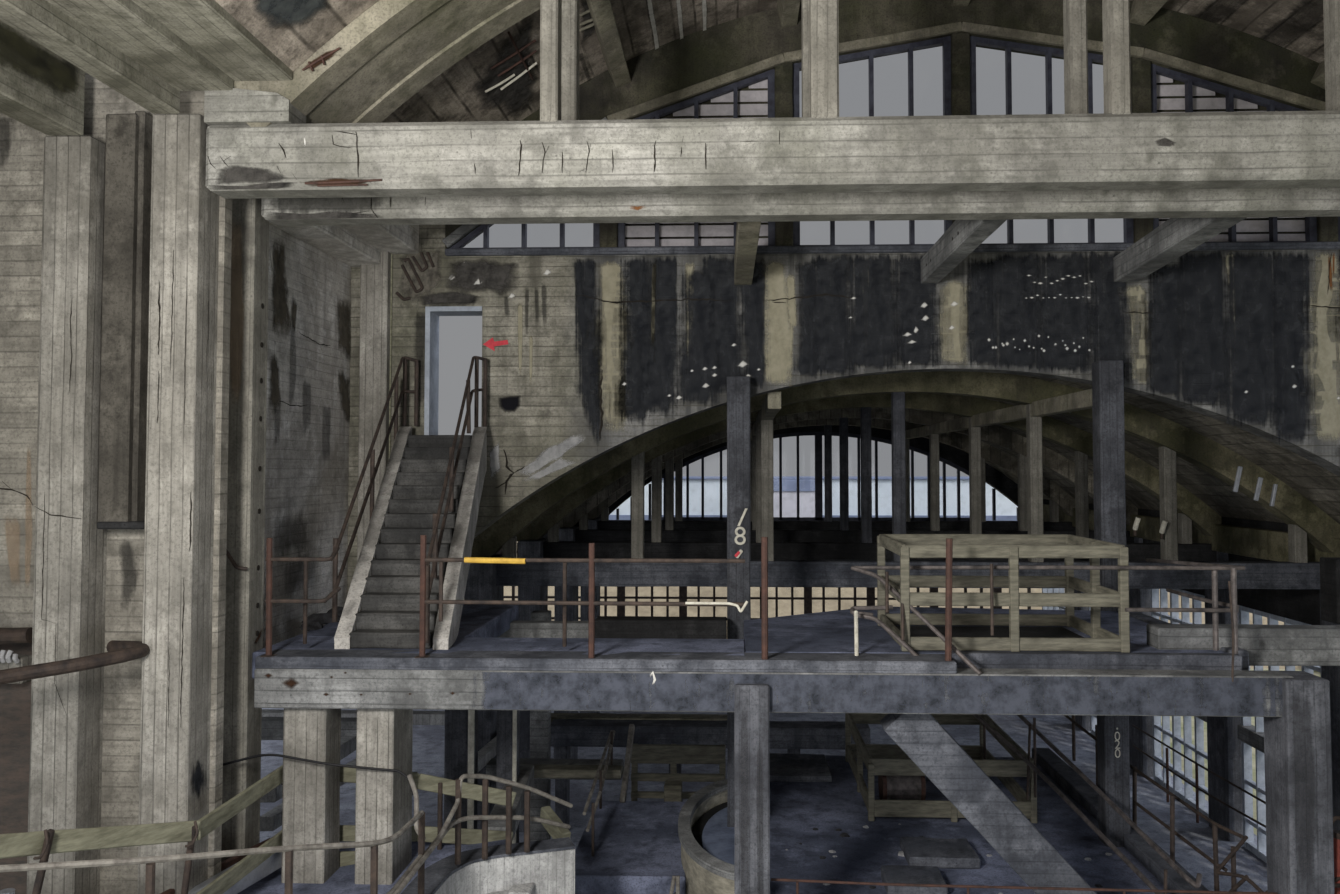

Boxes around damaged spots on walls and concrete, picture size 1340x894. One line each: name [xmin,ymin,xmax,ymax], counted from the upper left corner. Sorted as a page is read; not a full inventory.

damp [257,0,324,23]
spalling [472,21,537,116]
damp [574,251,1340,444]
peeling [524,437,582,478]
crack [0,481,81,716]